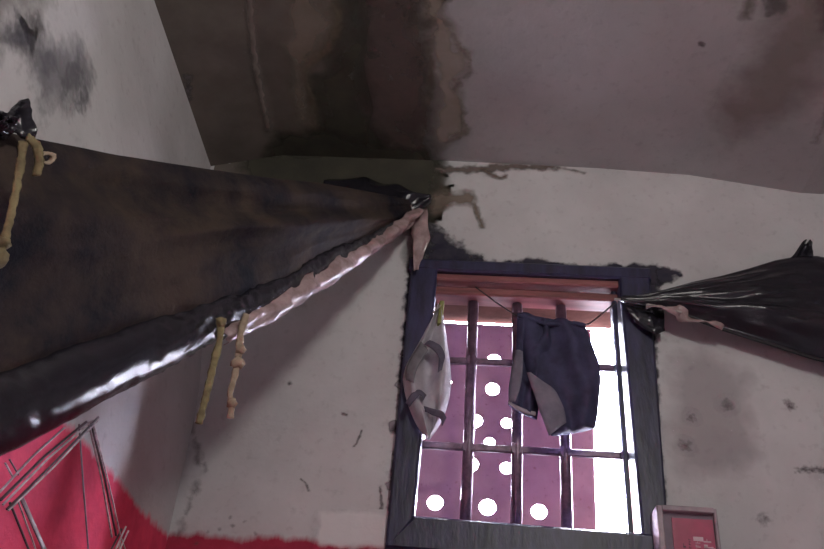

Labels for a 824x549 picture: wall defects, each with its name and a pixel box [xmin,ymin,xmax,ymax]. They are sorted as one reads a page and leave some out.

crack [435,164,577,179]